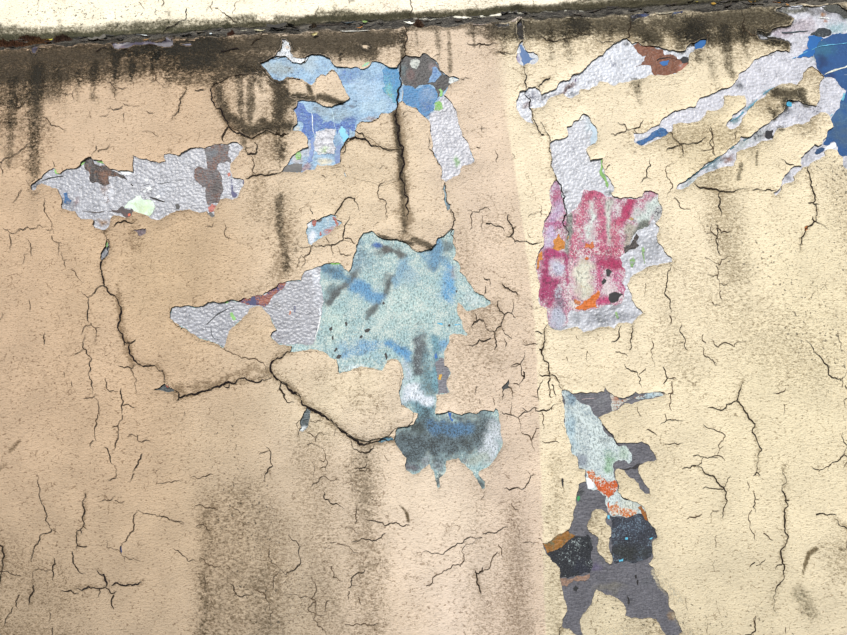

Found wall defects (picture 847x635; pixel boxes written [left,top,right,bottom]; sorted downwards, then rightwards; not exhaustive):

peeling [22,134,254,271]
peeling [170,21,522,501]
crack [471,278,588,450]
peeling [473,0,847,343]
crack [611,119,715,210]
crack [645,263,744,364]
crack [694,183,773,305]
crack [782,159,827,245]
crack [806,340,847,407]
crack [426,474,536,593]
peeling [531,376,694,635]
crack [611,325,789,635]